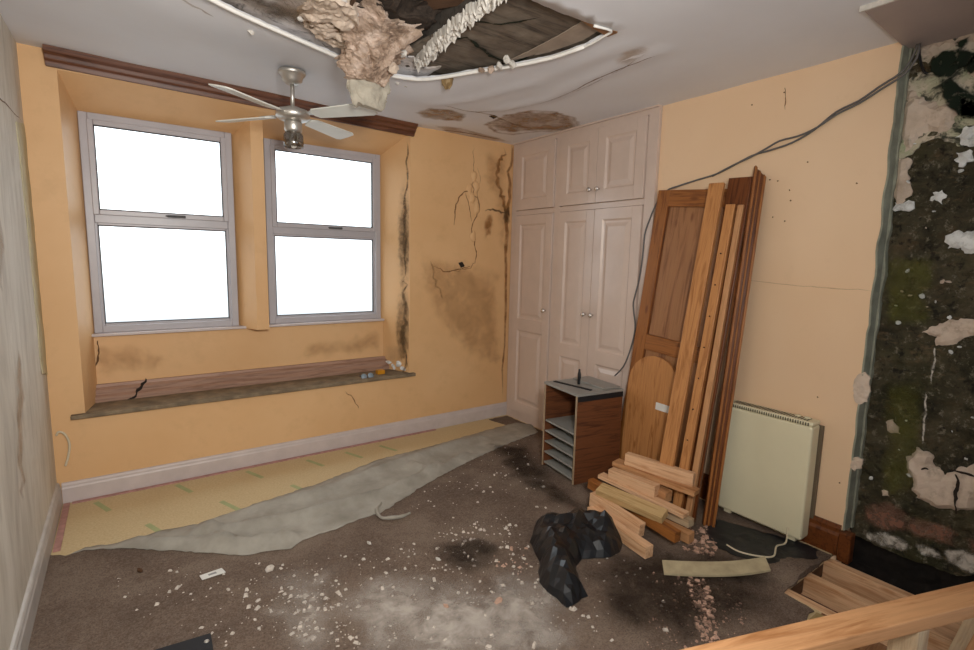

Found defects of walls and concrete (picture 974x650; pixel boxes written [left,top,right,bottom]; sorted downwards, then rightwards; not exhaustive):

damp [249,0,341,39]
spalling [297,0,360,50]
spalling [414,0,507,73]
damp [399,149,409,270]
crack [439,155,481,272]
efflorescence [892,200,915,212]
damp [933,190,947,204]
damp [944,230,974,254]
crack [127,378,147,400]
efflorescence [867,533,906,549]
spalling [866,505,953,541]
efflorescence [921,547,974,572]